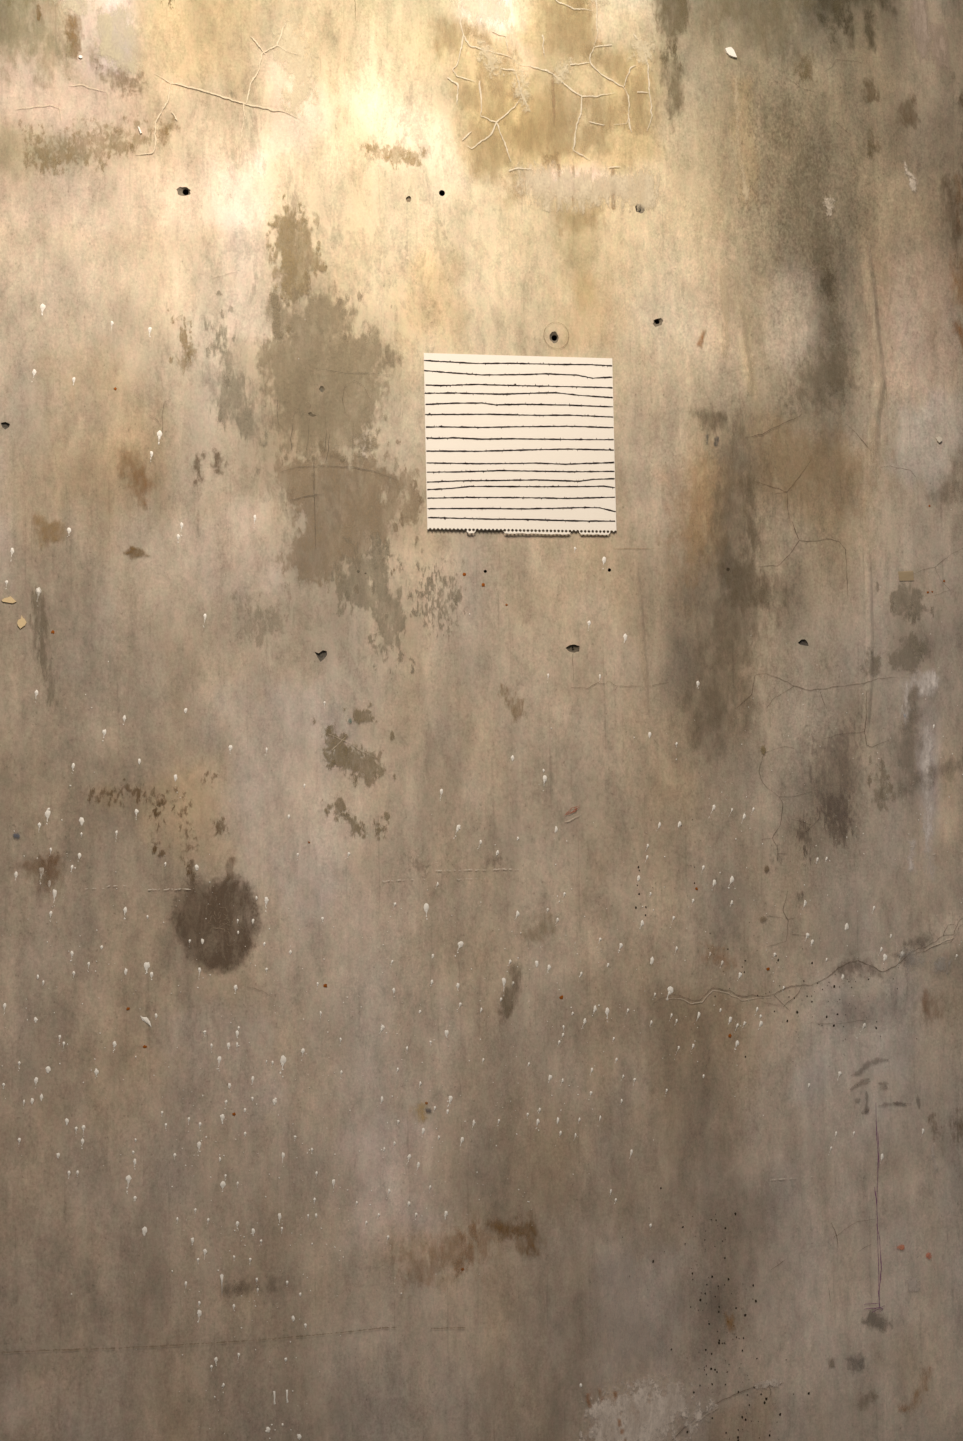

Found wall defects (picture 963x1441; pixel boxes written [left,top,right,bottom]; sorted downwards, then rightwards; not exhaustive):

crack [447,0,653,171]
water stain [171,859,259,970]
crack [654,918,963,1009]